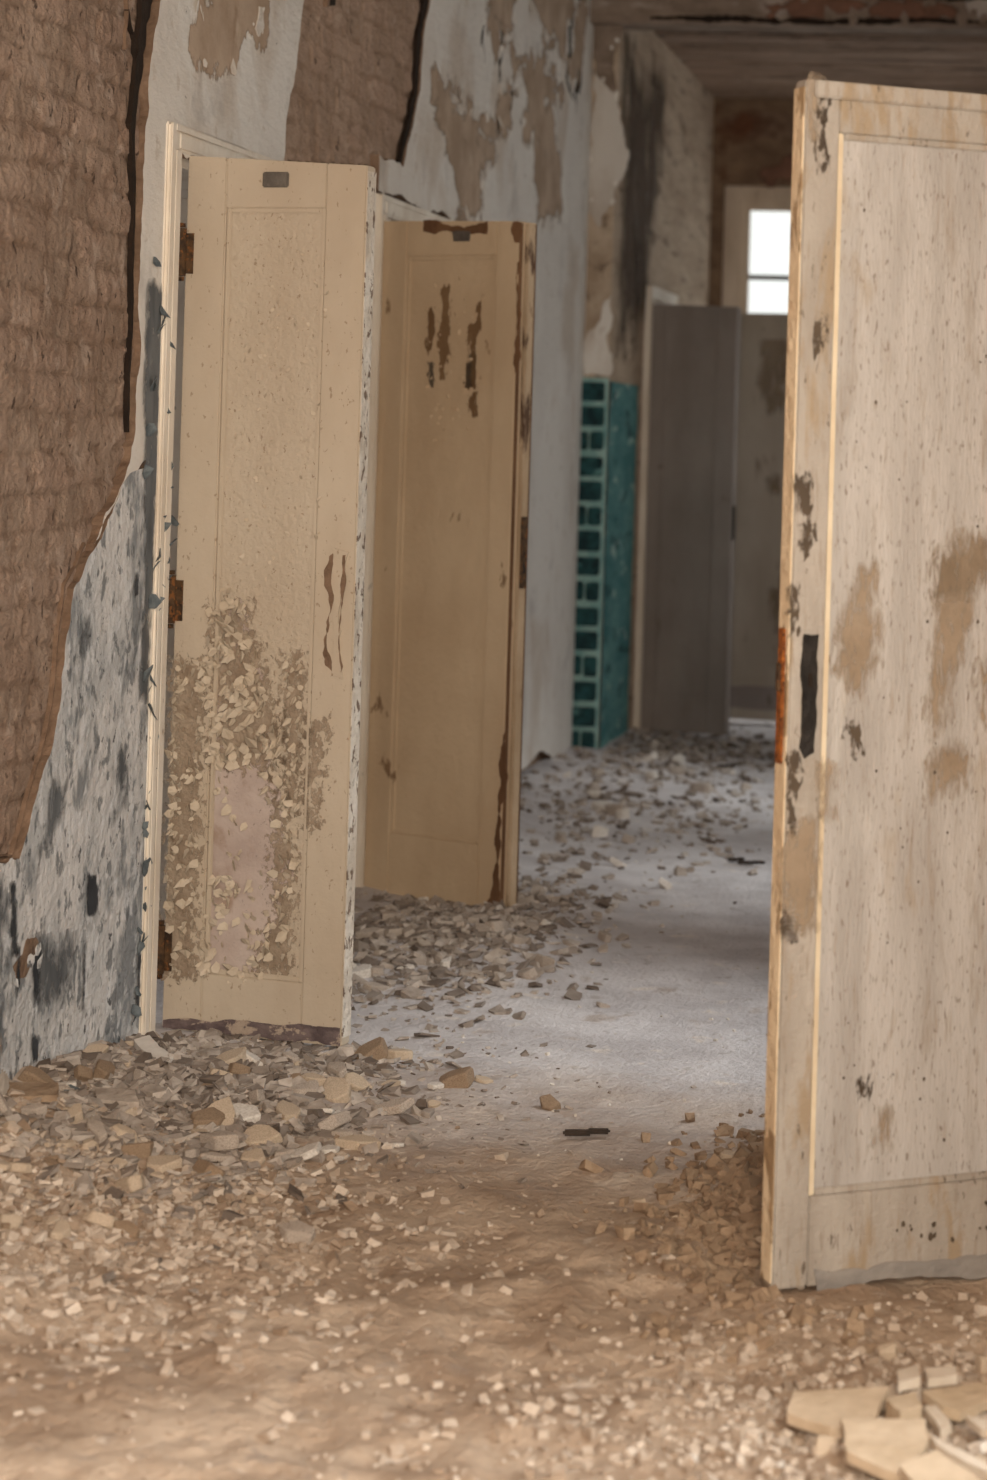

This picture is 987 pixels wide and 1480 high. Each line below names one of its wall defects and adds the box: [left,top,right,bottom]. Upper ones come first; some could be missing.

peeling [423,0,630,243]
damp [620,45,665,343]
peeling [424,284,481,418]
peeling [513,262,522,373]
peeling [584,296,613,376]
spalling [0,0,334,987]
spalling [284,0,420,1038]
peeling [487,730,508,904]
peeling [842,717,865,761]
peeling [833,562,880,696]
peeling [918,525,987,797]
peeling [842,1064,894,1100]